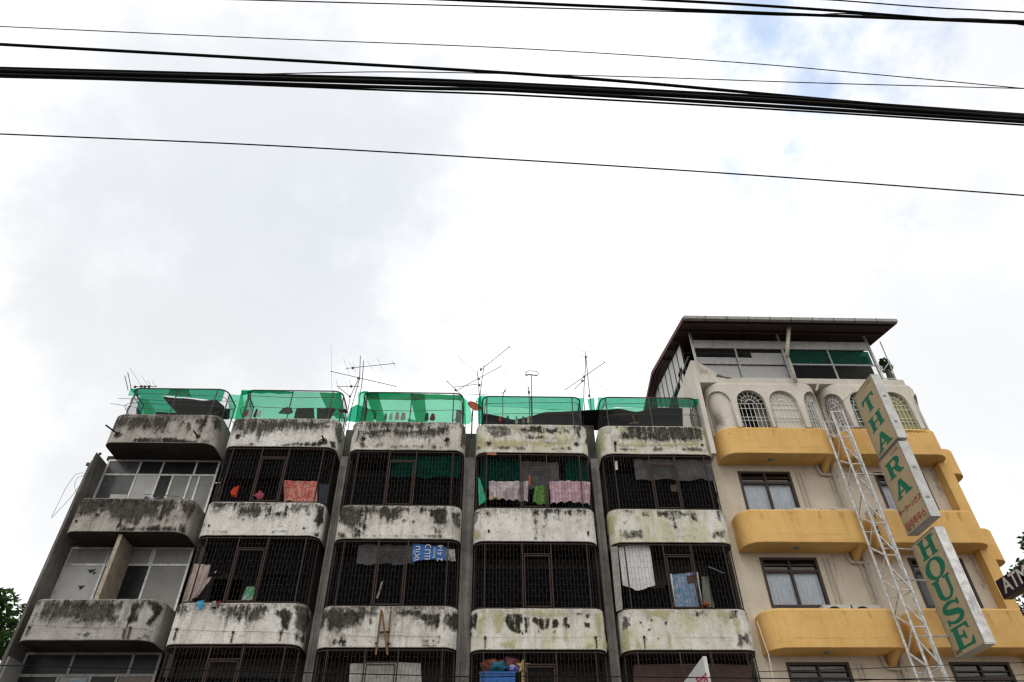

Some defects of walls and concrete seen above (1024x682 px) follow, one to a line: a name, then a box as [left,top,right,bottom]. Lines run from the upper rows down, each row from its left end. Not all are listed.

damp [113,415,480,449]
damp [487,425,587,450]
damp [616,426,707,451]
damp [72,499,196,533]
damp [211,503,324,537]
damp [338,506,461,538]
damp [532,509,608,540]
damp [626,510,698,529]
damp [36,600,164,639]
damp [211,604,376,646]
damp [390,607,477,646]